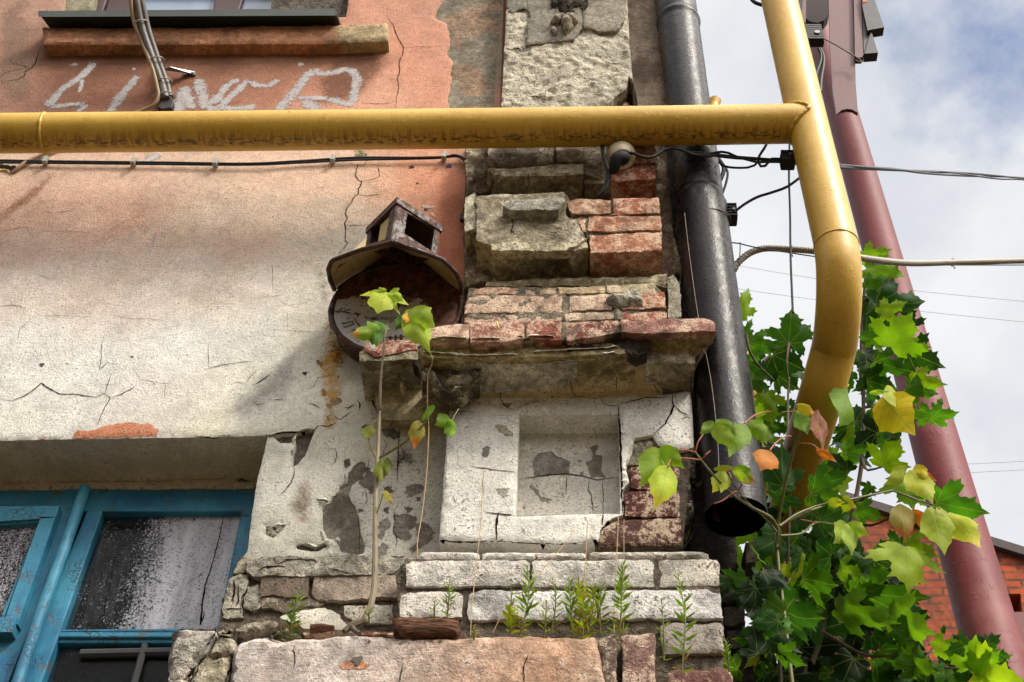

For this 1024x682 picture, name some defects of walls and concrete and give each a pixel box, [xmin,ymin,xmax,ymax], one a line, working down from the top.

crack [371,13,424,104]
peeling [435,0,502,108]
crack [344,154,380,247]
crack [1,341,176,420]
peeling [72,422,159,439]
peeling [266,523,286,537]
flaking render [266,425,318,466]
flaking render [297,459,435,556]
peeling [381,428,400,439]
crack [439,377,691,549]
peeling [529,445,606,501]